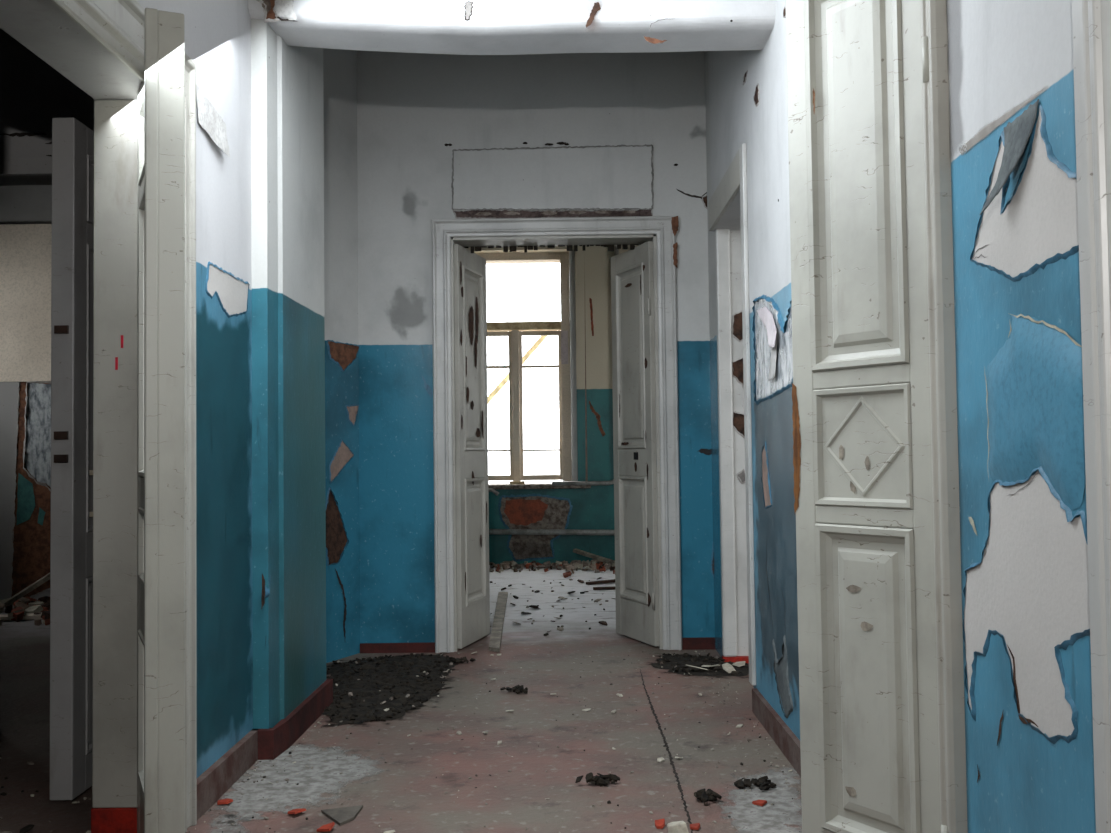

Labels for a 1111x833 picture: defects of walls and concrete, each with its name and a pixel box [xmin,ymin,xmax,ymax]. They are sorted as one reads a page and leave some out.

flaking render [256,0,297,23]
peeling [970,99,1079,282]
peeling [205,261,250,318]
peeling [326,340,359,372]
peeling [345,404,359,426]
peeling [731,295,801,513]
flaking render [10,381,51,598]
flaking render [325,439,354,566]
flaking render [480,494,573,562]
peeling [962,466,1090,744]